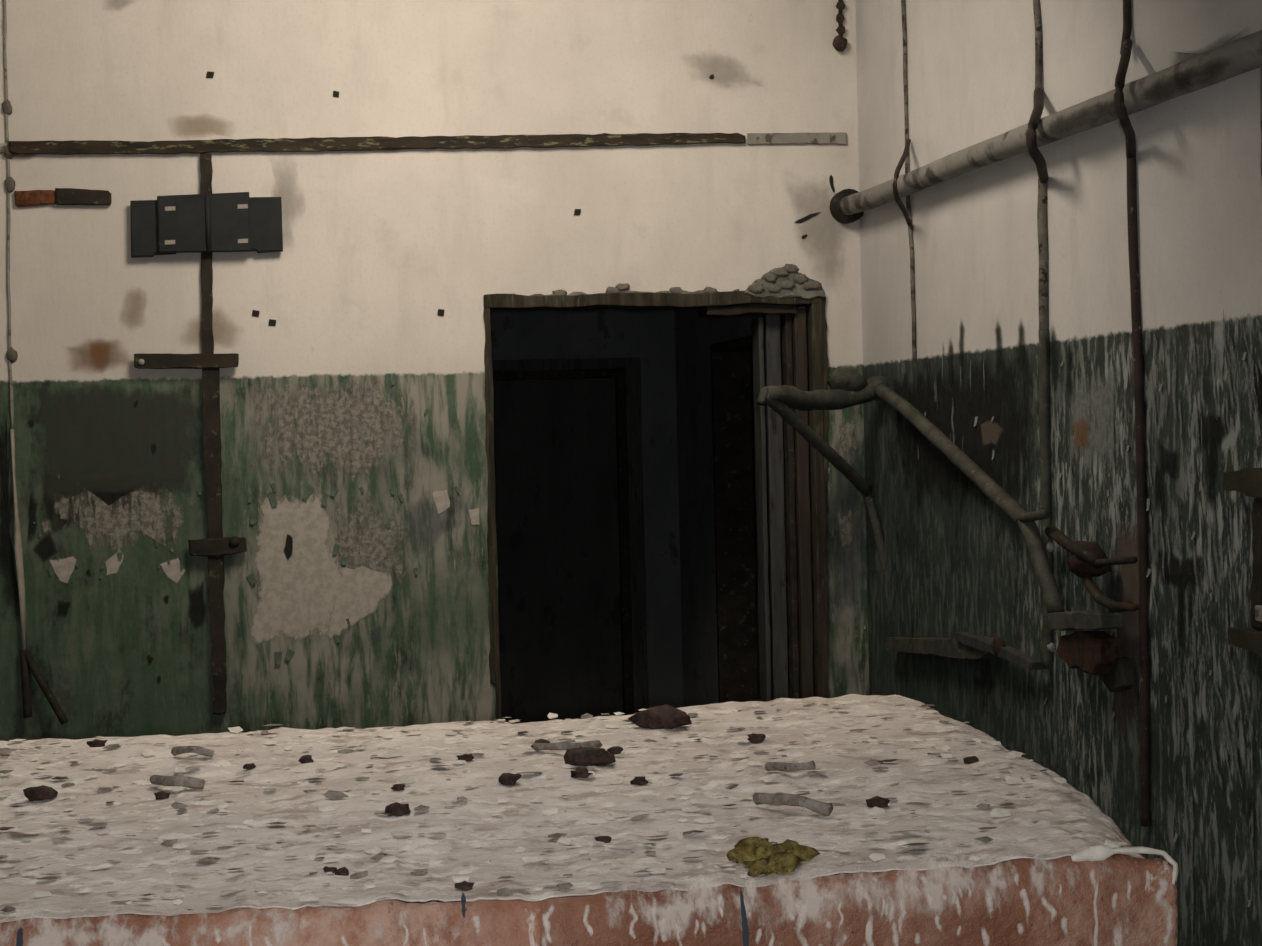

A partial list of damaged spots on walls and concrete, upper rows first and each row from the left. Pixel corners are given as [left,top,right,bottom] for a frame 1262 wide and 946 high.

peeling [0,426,19,613]
corrosion [79,344,114,366]
peeling [28,485,201,583]
peeling [189,584,205,626]
peeling [246,375,429,665]
peeling [432,486,460,514]
spalling [468,308,495,685]
spalling [605,264,828,390]
peeling [973,416,1002,460]
peeling [0,724,313,911]
peeling [242,727,510,902]
peeling [421,702,1087,897]